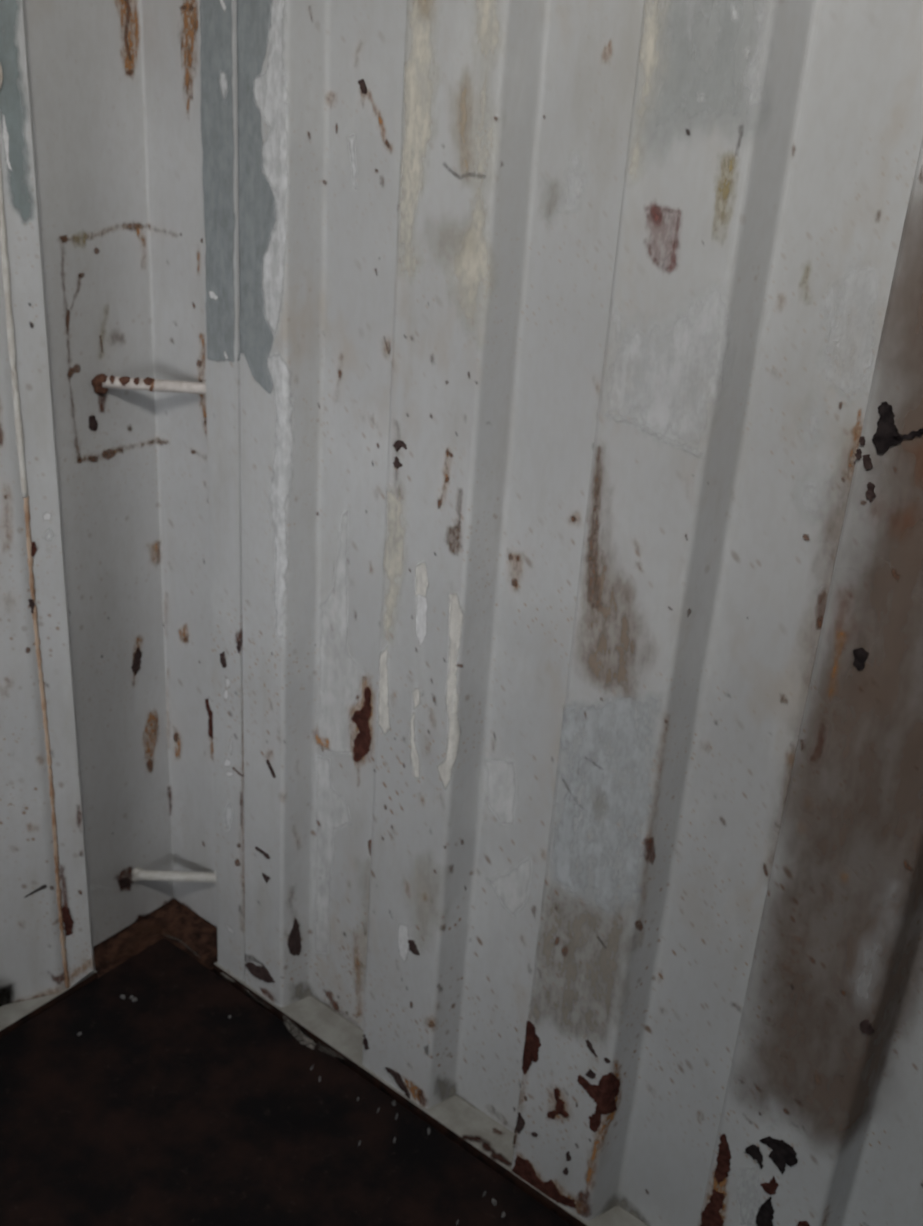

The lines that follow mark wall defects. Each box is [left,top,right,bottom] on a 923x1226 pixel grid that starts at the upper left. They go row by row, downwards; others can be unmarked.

corrosion [119,0,139,75]
corrosion [181,0,198,113]
corrosion [651,206,661,223]
corrosion [66,310,80,378]
corrosion [88,375,153,431]
corrosion [75,439,123,463]
water stain [587,447,635,691]
water stain [759,231,923,1140]
corrosion [462,1128,576,1208]